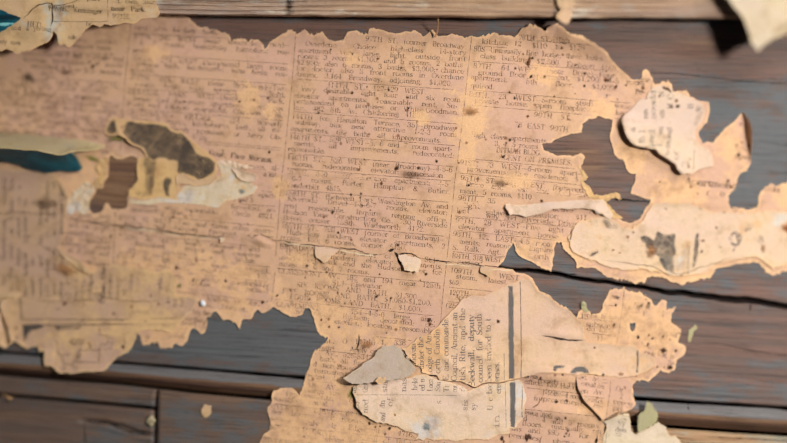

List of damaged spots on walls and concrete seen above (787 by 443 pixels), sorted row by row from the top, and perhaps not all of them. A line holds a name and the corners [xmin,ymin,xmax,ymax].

peeling [93,157,108,189]
crack [0,184,231,239]
peeling [579,167,622,219]
crack [614,196,649,204]
crack [250,234,787,311]